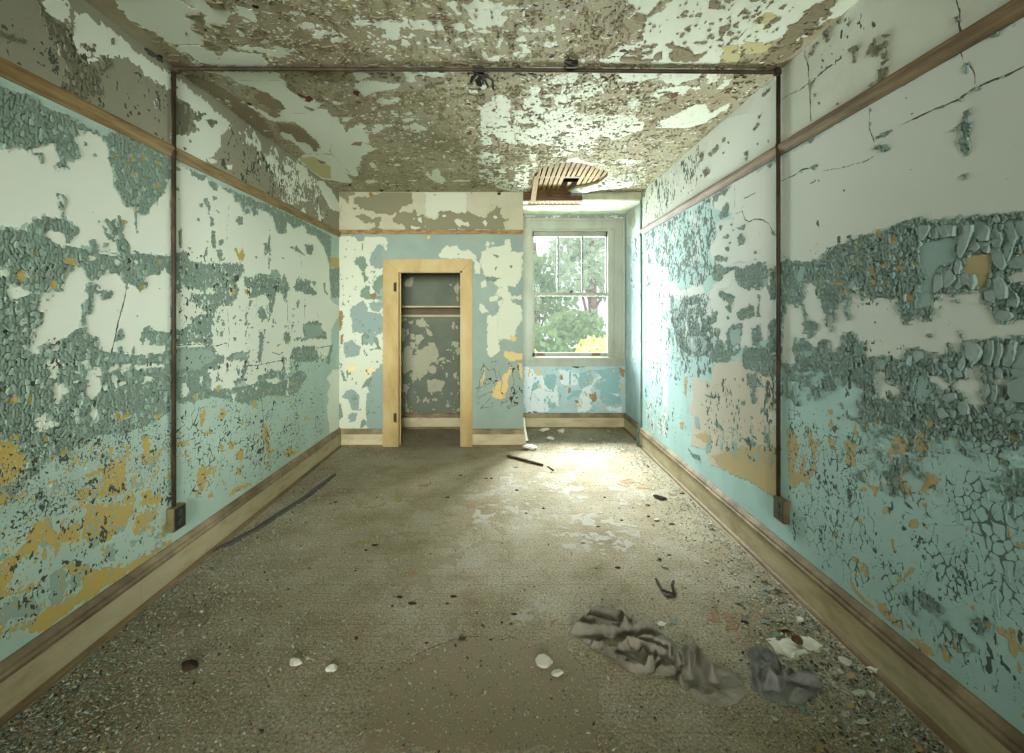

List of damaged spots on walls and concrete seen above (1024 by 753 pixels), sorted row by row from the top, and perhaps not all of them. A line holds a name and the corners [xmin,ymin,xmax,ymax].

peeling [0,0,1024,514]
crack [769,22,888,120]
crack [912,0,1024,152]
peeling [0,367,953,753]
crack [673,215,1024,704]
peeling [905,592,1011,674]